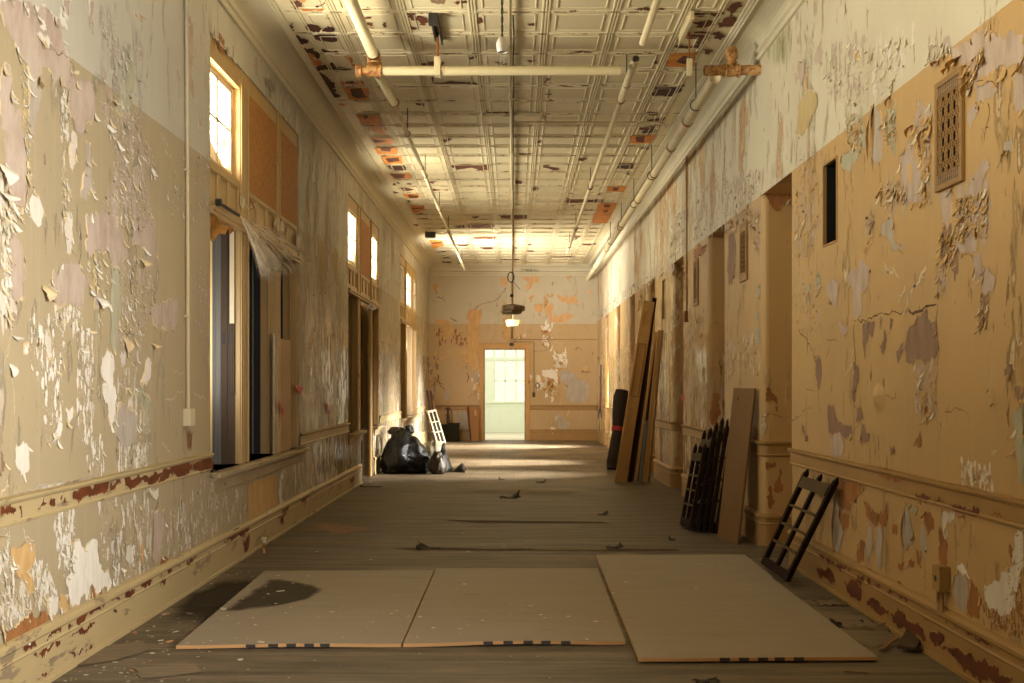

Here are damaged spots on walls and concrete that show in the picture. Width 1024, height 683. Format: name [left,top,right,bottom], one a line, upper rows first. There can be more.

rust [289,0,370,106]
peeling [925,24,1024,127]
peeling [522,21,995,463]
peeling [0,0,310,659]
peeling [420,282,483,429]
crack [799,263,966,462]
peeling [960,455,994,492]
peeling [1004,363,1024,485]
peeling [816,478,1024,683]